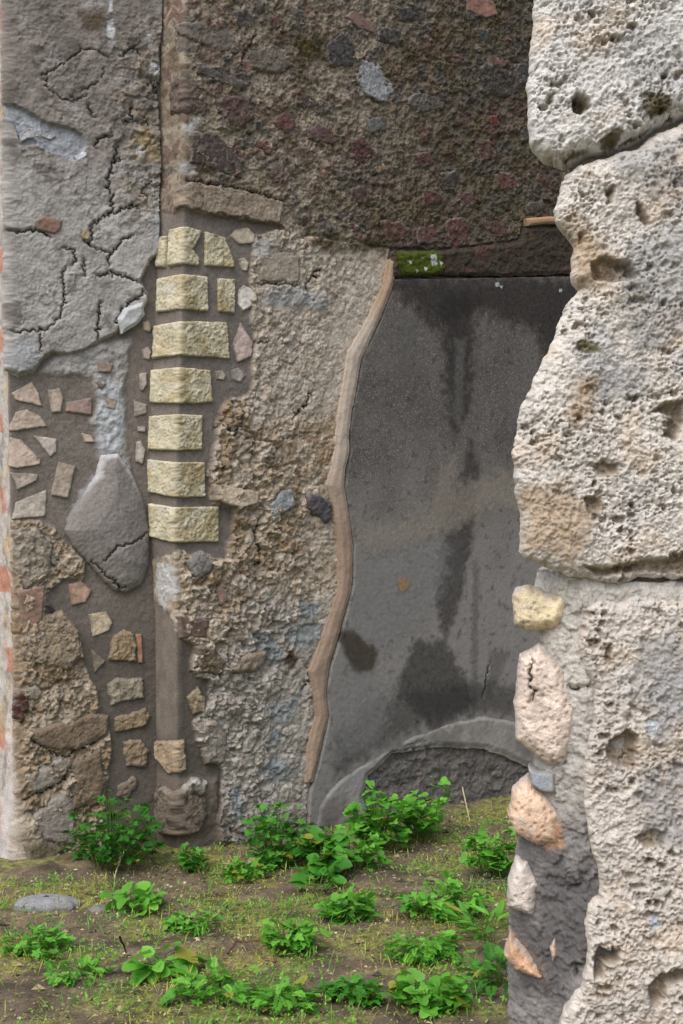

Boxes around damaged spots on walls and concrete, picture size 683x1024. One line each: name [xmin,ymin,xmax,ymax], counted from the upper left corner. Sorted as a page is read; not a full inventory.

crack [11,48,159,349]
leakage [396,279,578,426]
crack [91,534,145,590]
leakage [339,630,377,671]
crack [528,654,537,701]